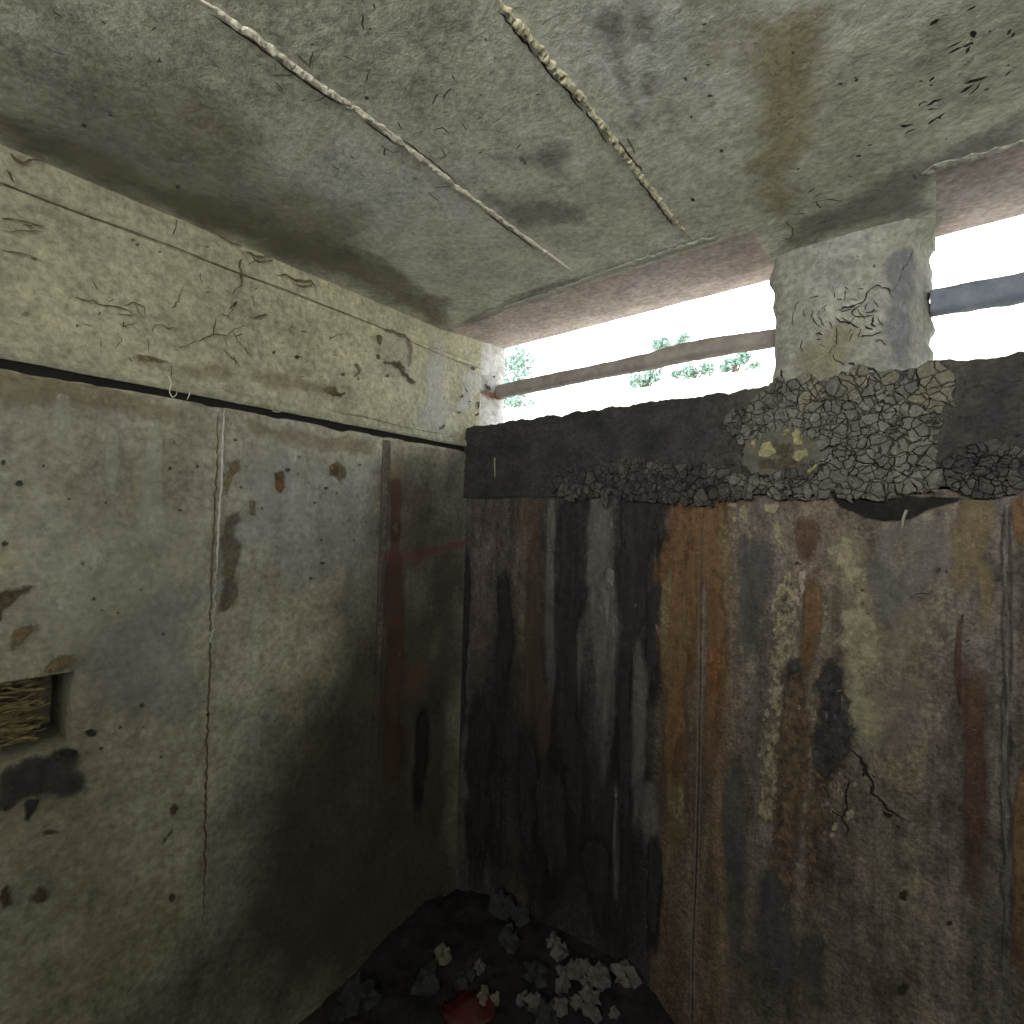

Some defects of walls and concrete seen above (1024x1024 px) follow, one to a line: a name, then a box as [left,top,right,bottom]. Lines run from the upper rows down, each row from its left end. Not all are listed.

crack [212,15,339,104]
crack [365,121,457,183]
crack [499,12,673,226]
crack [487,214,534,249]
crack [0,182,482,369]
peeling [376,328,415,384]
crack [549,250,1024,509]
rust [796,519,819,560]
rust [656,499,705,837]
rust [801,582,823,668]
damp [0,749,85,821]
crack [823,749,904,836]